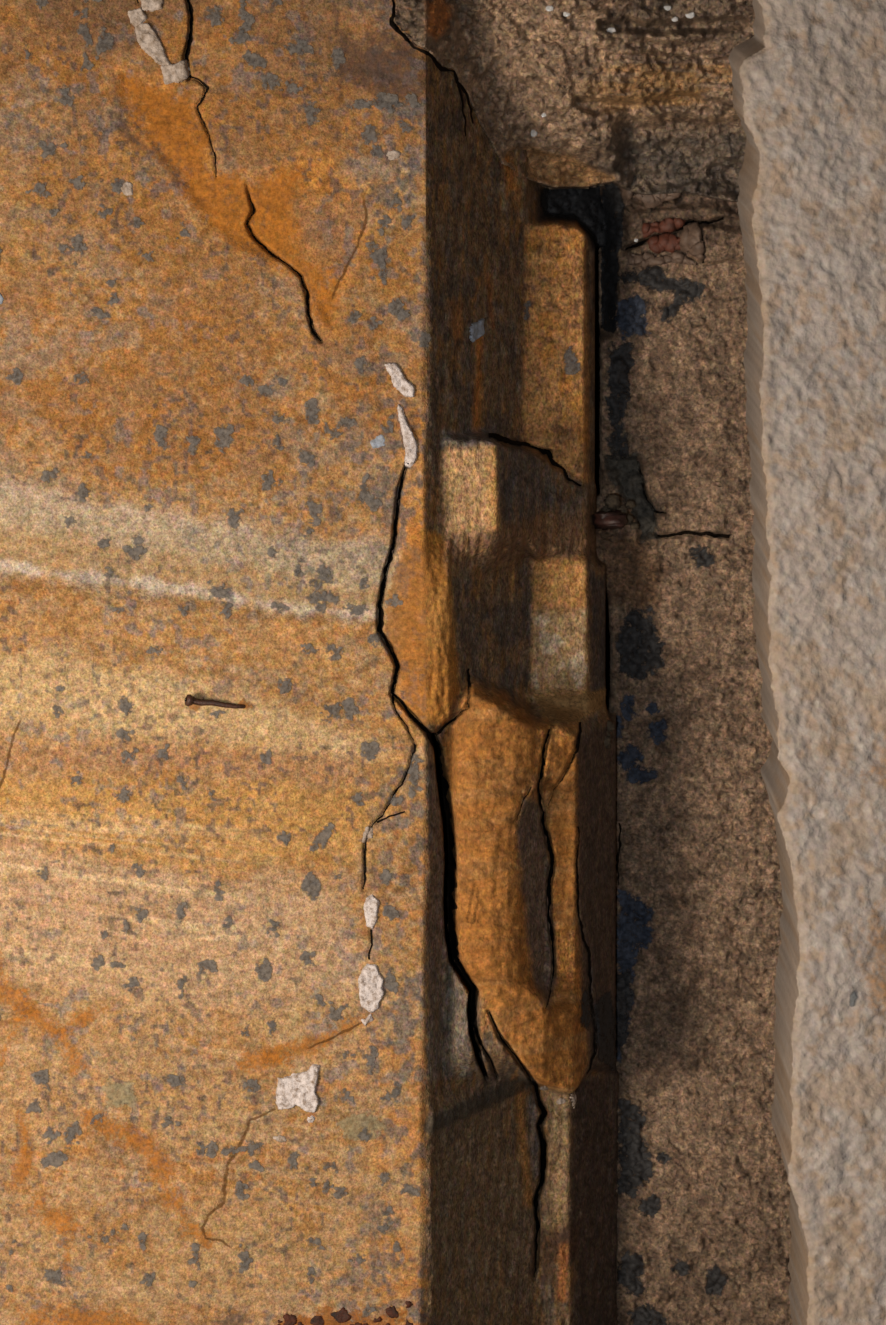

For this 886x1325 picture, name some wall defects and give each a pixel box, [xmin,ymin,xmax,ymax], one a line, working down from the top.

crack [389,0,474,136]
crack [185,0,367,341]
crack [603,601,611,697]
crack [362,467,547,1277]
crack [516,722,598,1074]
crack [310,1022,362,1048]
crack [202,1109,274,1247]
rust [278,1301,413,1325]